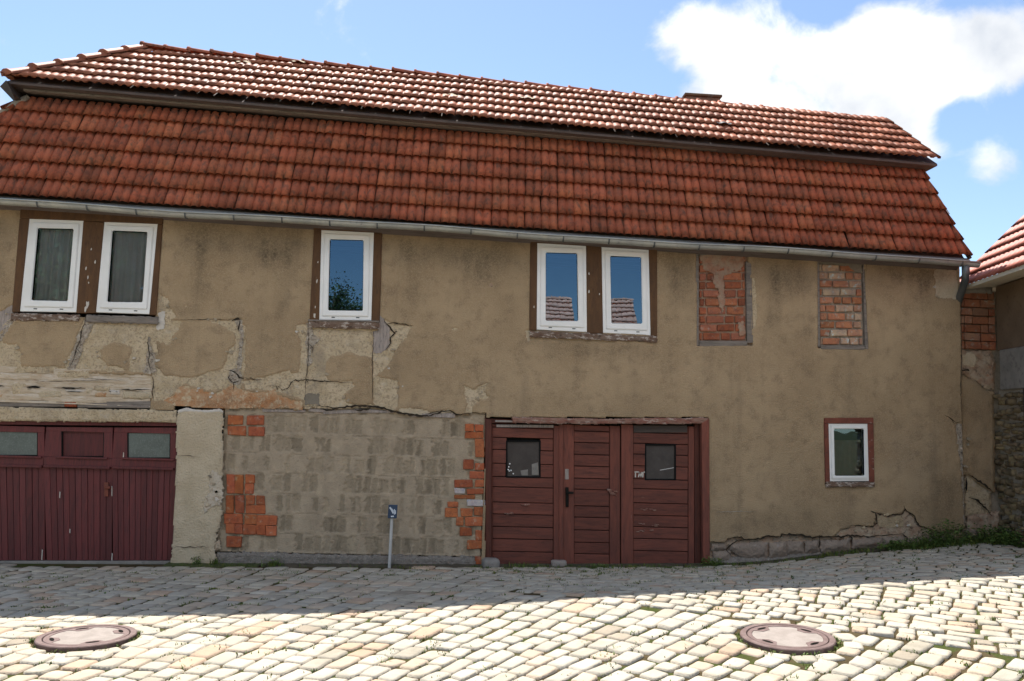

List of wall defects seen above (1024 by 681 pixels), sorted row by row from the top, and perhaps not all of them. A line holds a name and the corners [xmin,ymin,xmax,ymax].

peeling [0,293,452,436]
crack [228,320,484,417]
flaking render [203,470,278,547]
flaking render [445,383,489,564]
crack [711,507,944,555]
crack [969,476,992,516]